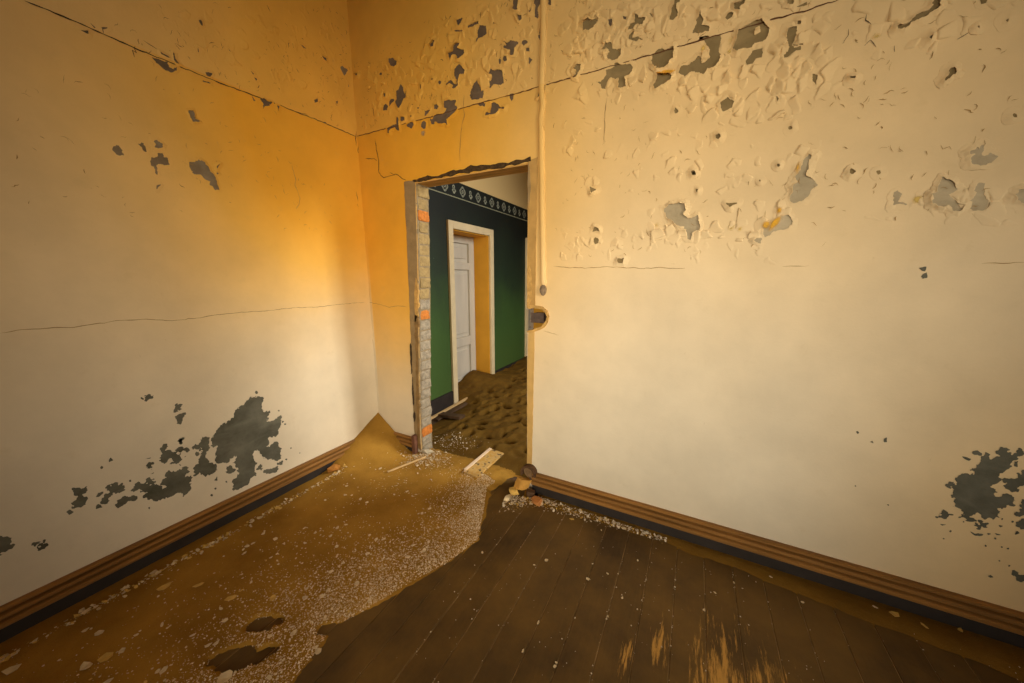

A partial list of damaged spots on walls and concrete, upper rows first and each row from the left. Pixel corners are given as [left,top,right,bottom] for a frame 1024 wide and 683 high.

peeling [109,135,223,193]
crack [24,0,906,230]
peeling [377,0,555,138]
peeling [650,165,704,243]
peeling [569,0,815,95]
peeling [747,148,823,246]
crack [736,147,877,250]
peeling [888,0,948,51]
peeling [885,137,1024,218]
crack [5,302,405,333]
peeling [67,391,292,515]
peeling [935,447,1024,582]